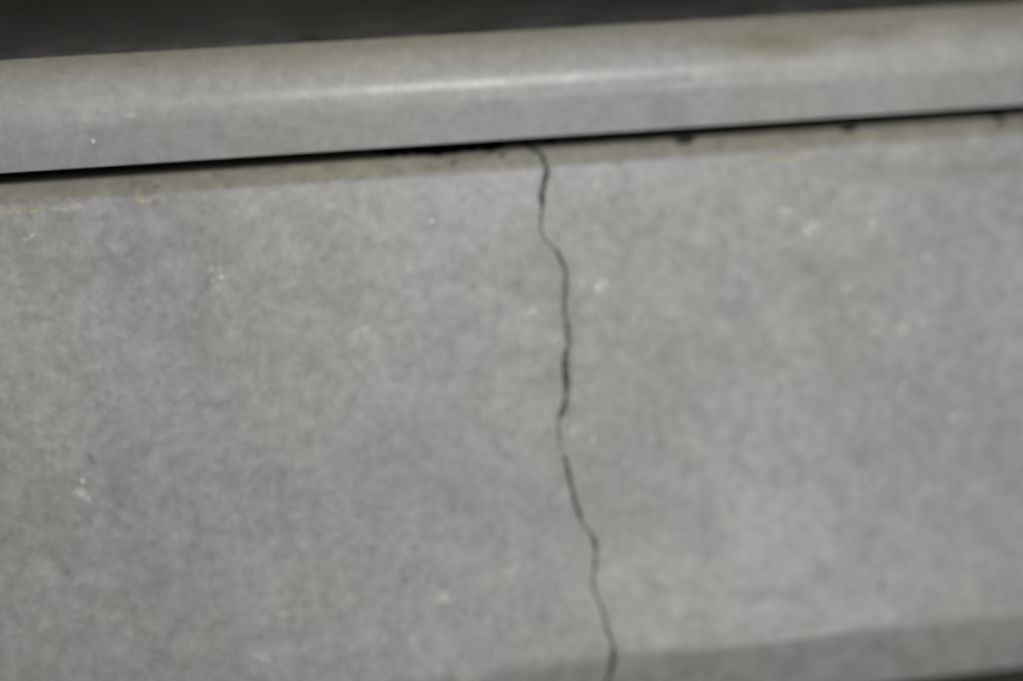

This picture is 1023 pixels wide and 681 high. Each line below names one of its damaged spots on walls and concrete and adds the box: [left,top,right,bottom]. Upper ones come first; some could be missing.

crack [521,142,615,681]